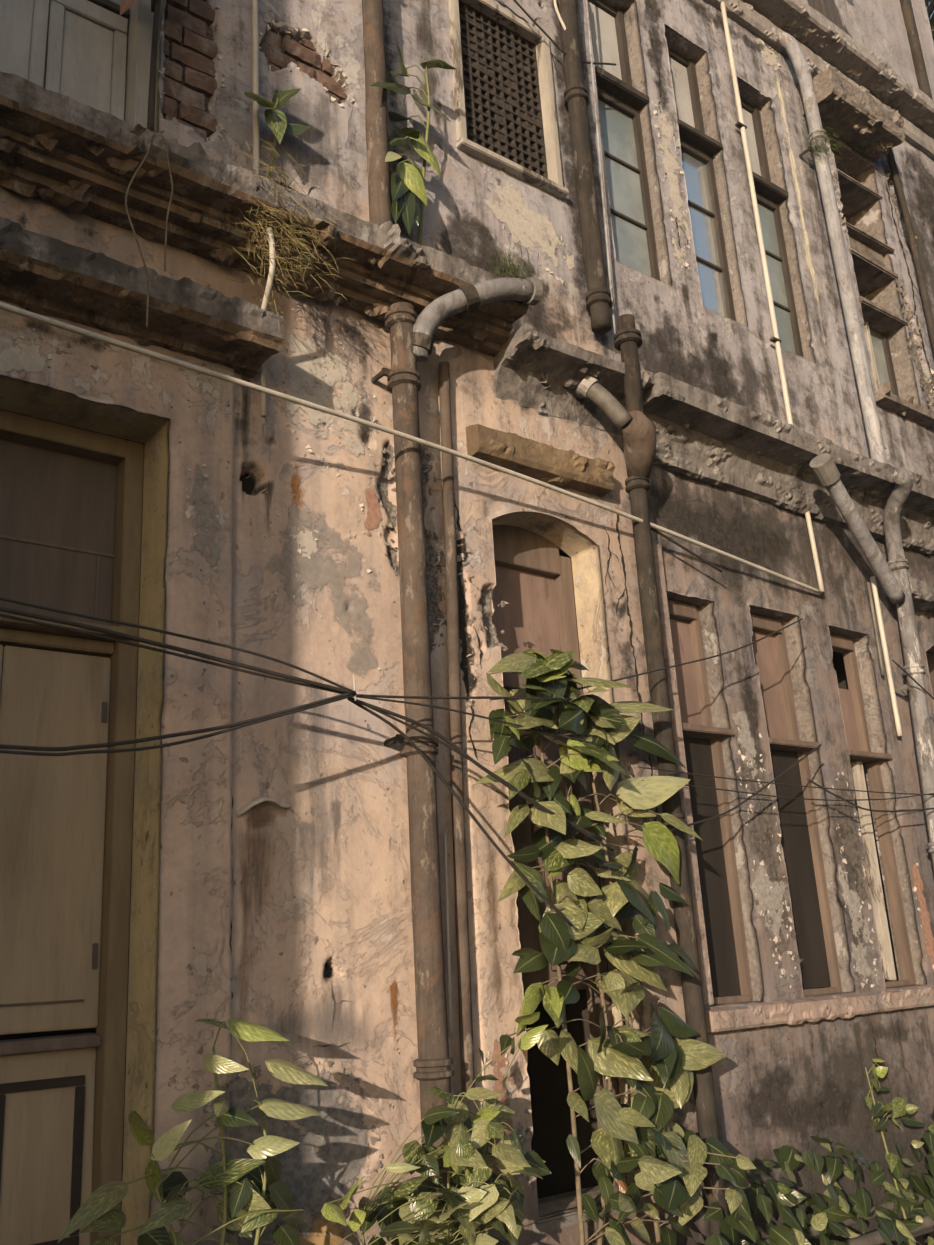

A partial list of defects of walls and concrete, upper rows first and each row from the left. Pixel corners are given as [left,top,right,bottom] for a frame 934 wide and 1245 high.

flaking render [157,0,226,142]
flaking render [258,14,356,108]
water stain [442,215,534,279]
water stain [513,284,565,339]
rust [291,468,302,516]
peeling [263,320,399,678]
crack [454,493,483,760]
crack [604,506,653,776]
peeling [732,711,803,988]
peeling [830,772,881,988]